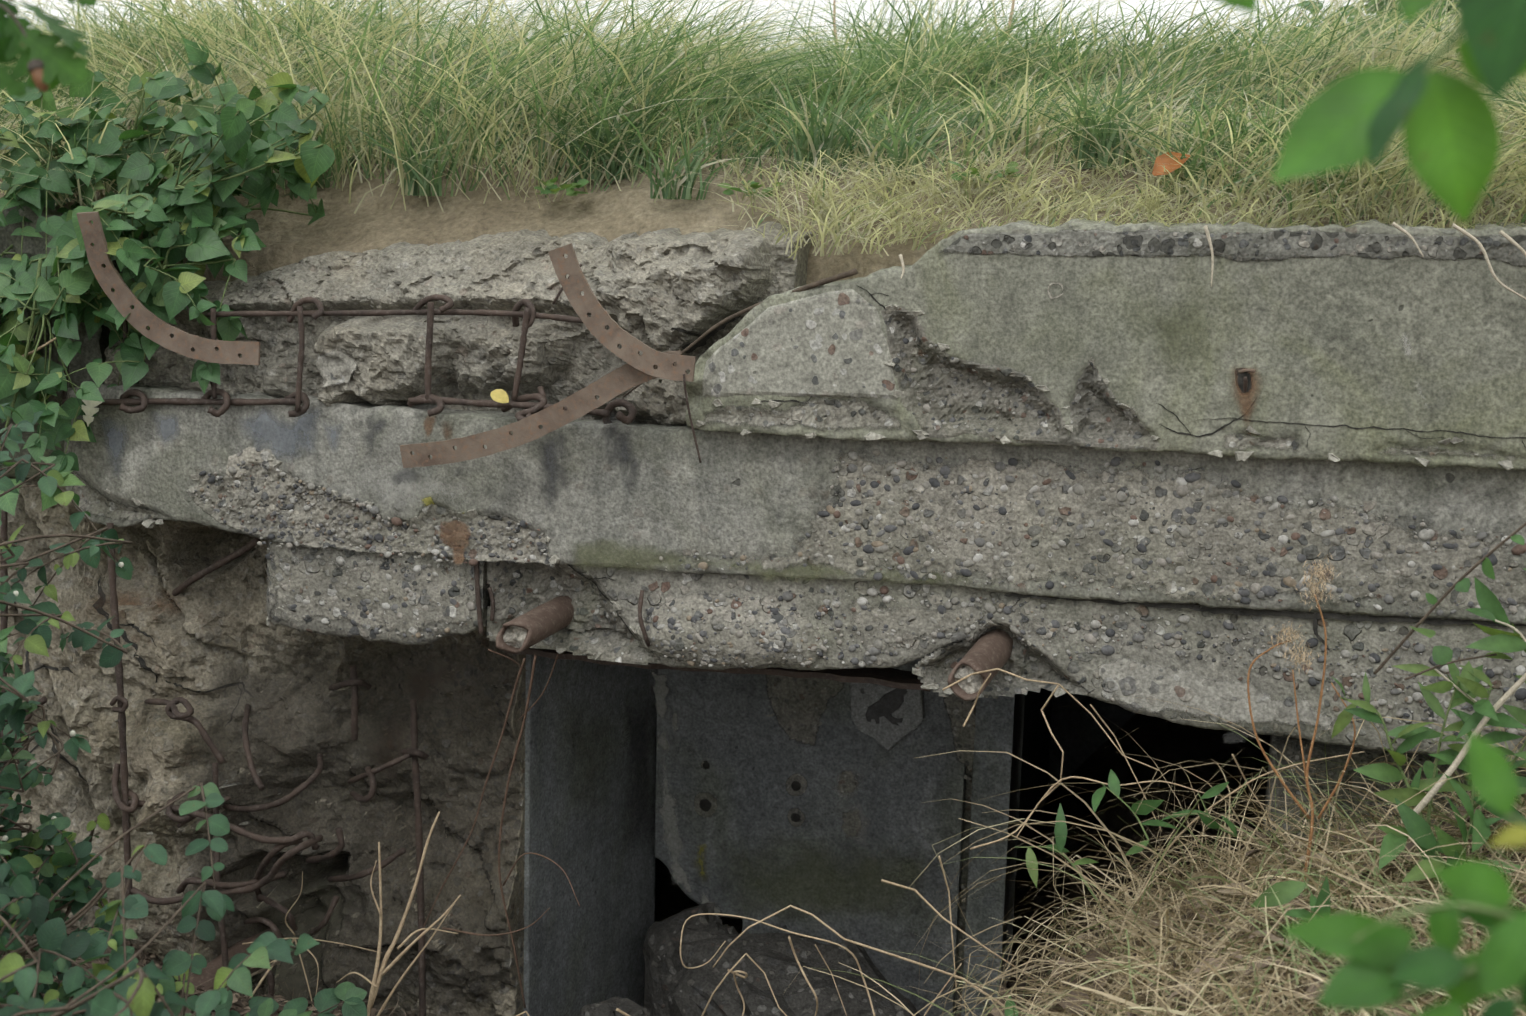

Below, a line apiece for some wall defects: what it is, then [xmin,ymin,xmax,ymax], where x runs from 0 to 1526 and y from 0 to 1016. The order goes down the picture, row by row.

spalling [62,264,583,421]
crack [1157,396,1526,470]
spalling [172,289,1526,780]